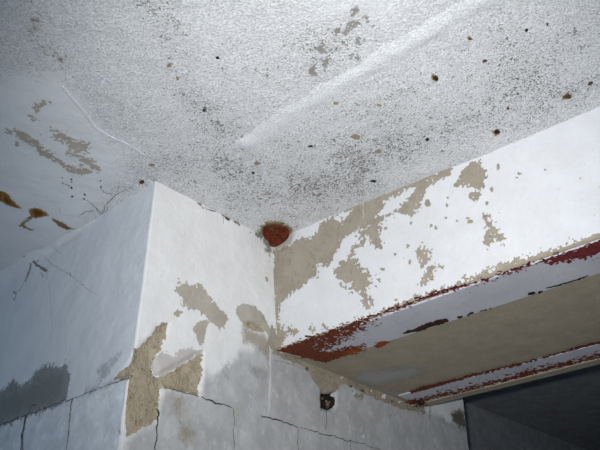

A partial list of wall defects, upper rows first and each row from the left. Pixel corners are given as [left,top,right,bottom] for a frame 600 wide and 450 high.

peeling [27,100,52,122]
peeling [4,126,101,176]
rust [0,191,21,209]
rust [20,208,71,230]
peeling [236,159,600,415]
water stain [0,363,70,427]
spalling [114,278,228,437]
crack [169,388,235,447]
crack [261,416,380,450]
rust [277,315,390,363]
rust [403,318,449,334]
rust [405,341,600,407]